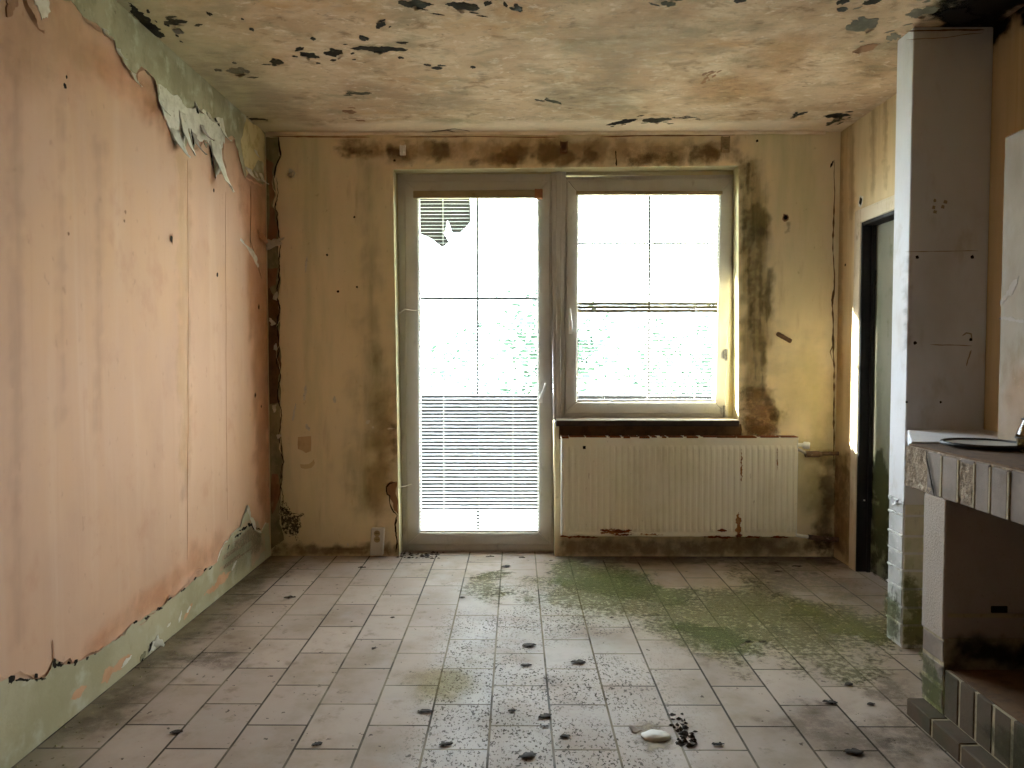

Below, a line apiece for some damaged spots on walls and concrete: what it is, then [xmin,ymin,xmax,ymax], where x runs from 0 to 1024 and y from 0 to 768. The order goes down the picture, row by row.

peeling [261,19,408,66]
peeling [398,0,523,17]
peeling [836,0,940,55]
peeling [342,91,371,121]
peeling [607,115,698,127]
peeling [825,111,853,126]
crack [250,136,365,515]
leakage [743,164,779,435]
crack [828,166,836,464]
peeling [0,0,295,768]
spalling [386,481,398,515]
leakage [563,459,850,558]